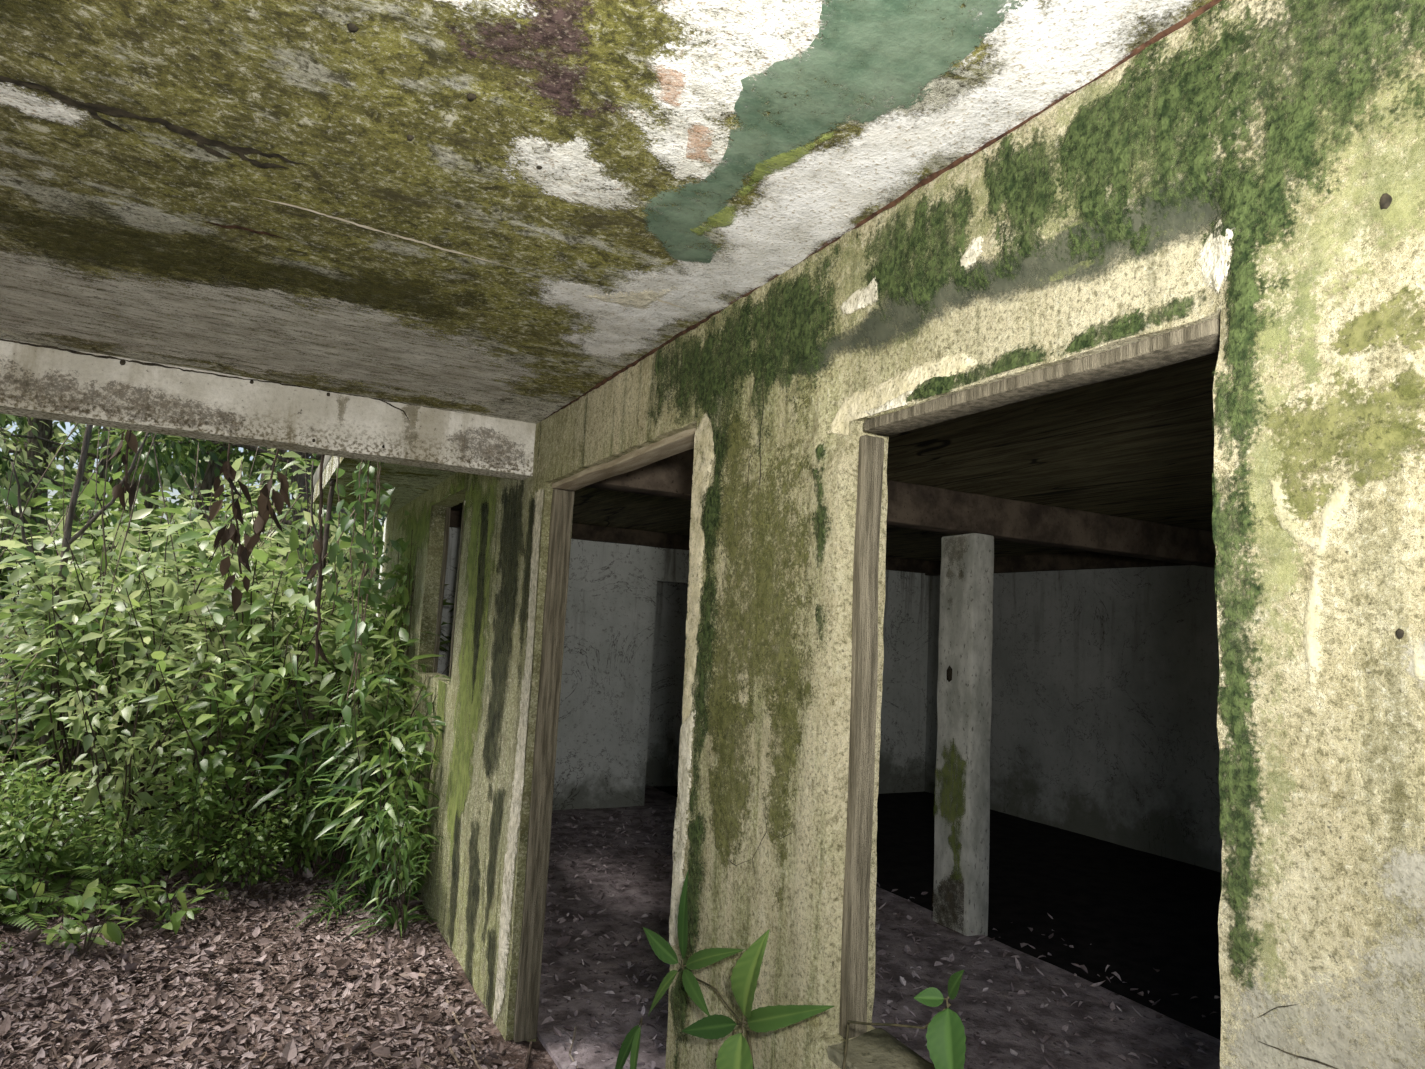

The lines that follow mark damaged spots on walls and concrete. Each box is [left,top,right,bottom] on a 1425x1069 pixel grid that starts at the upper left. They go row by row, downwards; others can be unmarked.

peeling [0,82,90,126]
peeling [502,135,637,210]
peeling [530,0,1191,362]
leakage [448,480,536,1017]